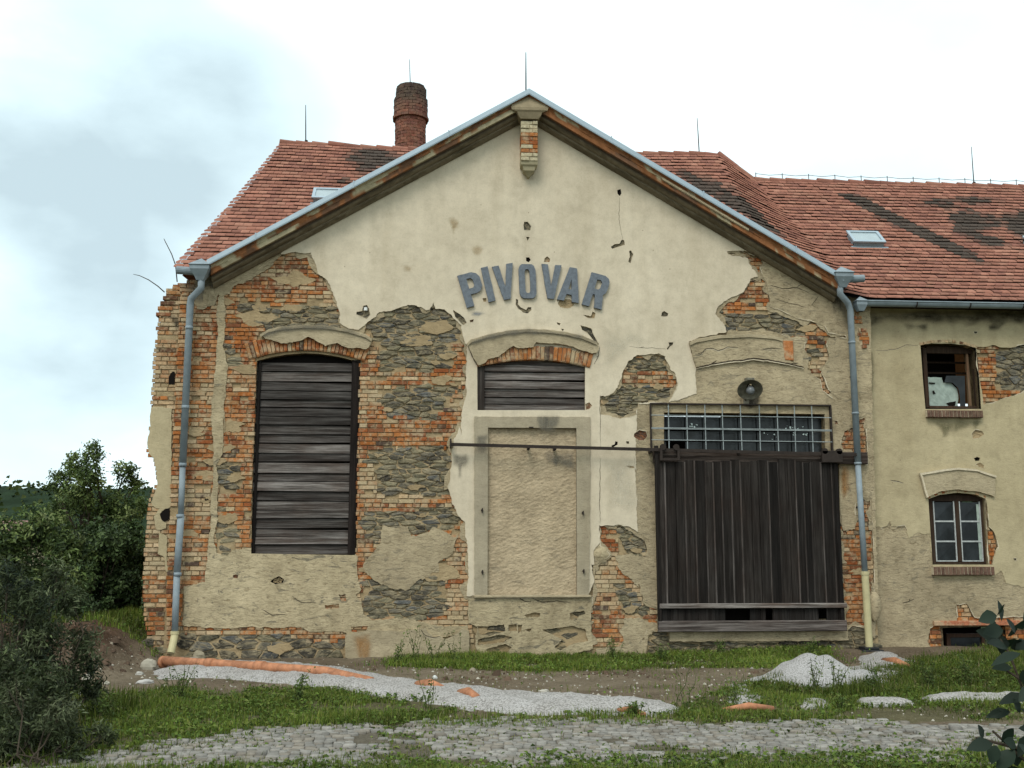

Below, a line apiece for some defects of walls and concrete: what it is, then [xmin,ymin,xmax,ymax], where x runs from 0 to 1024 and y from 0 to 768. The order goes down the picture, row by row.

flaking render [716,250,869,400]
flaking render [585,343,678,419]
flaking render [974,331,1024,405]
flaking render [142,253,519,660]
flaking render [835,416,869,465]
flaking render [545,498,907,654]
flaking render [927,626,942,647]
flaking render [956,603,980,621]
flaking render [996,616,1024,640]